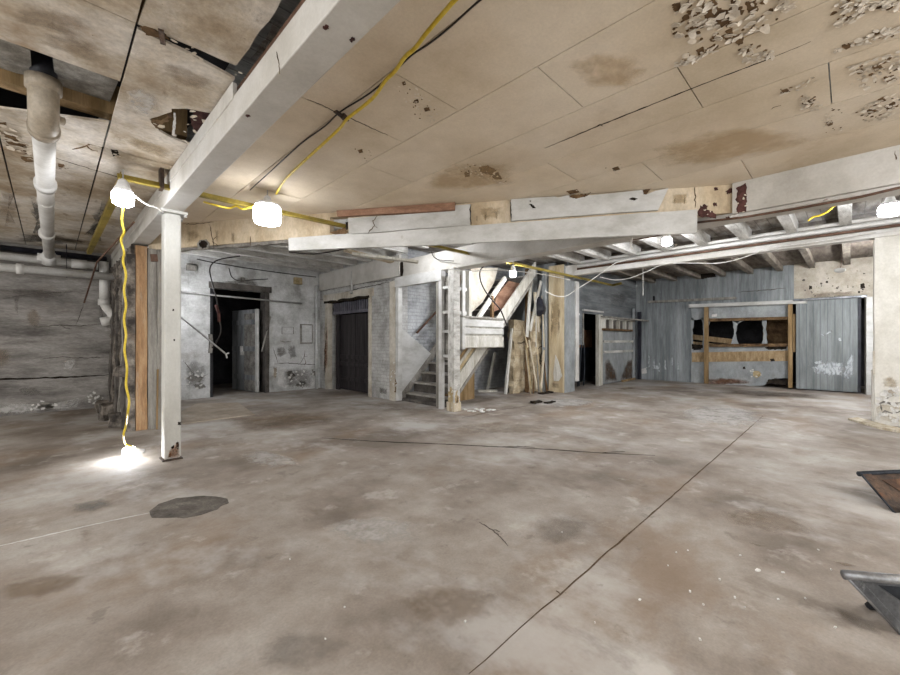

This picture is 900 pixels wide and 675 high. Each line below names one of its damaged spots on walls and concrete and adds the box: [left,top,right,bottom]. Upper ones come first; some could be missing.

peeling [830,0,900,28]
peeling [671,0,797,67]
peeling [833,26,900,53]
peeling [847,50,900,123]
spalling [151,110,210,144]
crack [327,438,655,456]
crack [469,416,763,674]